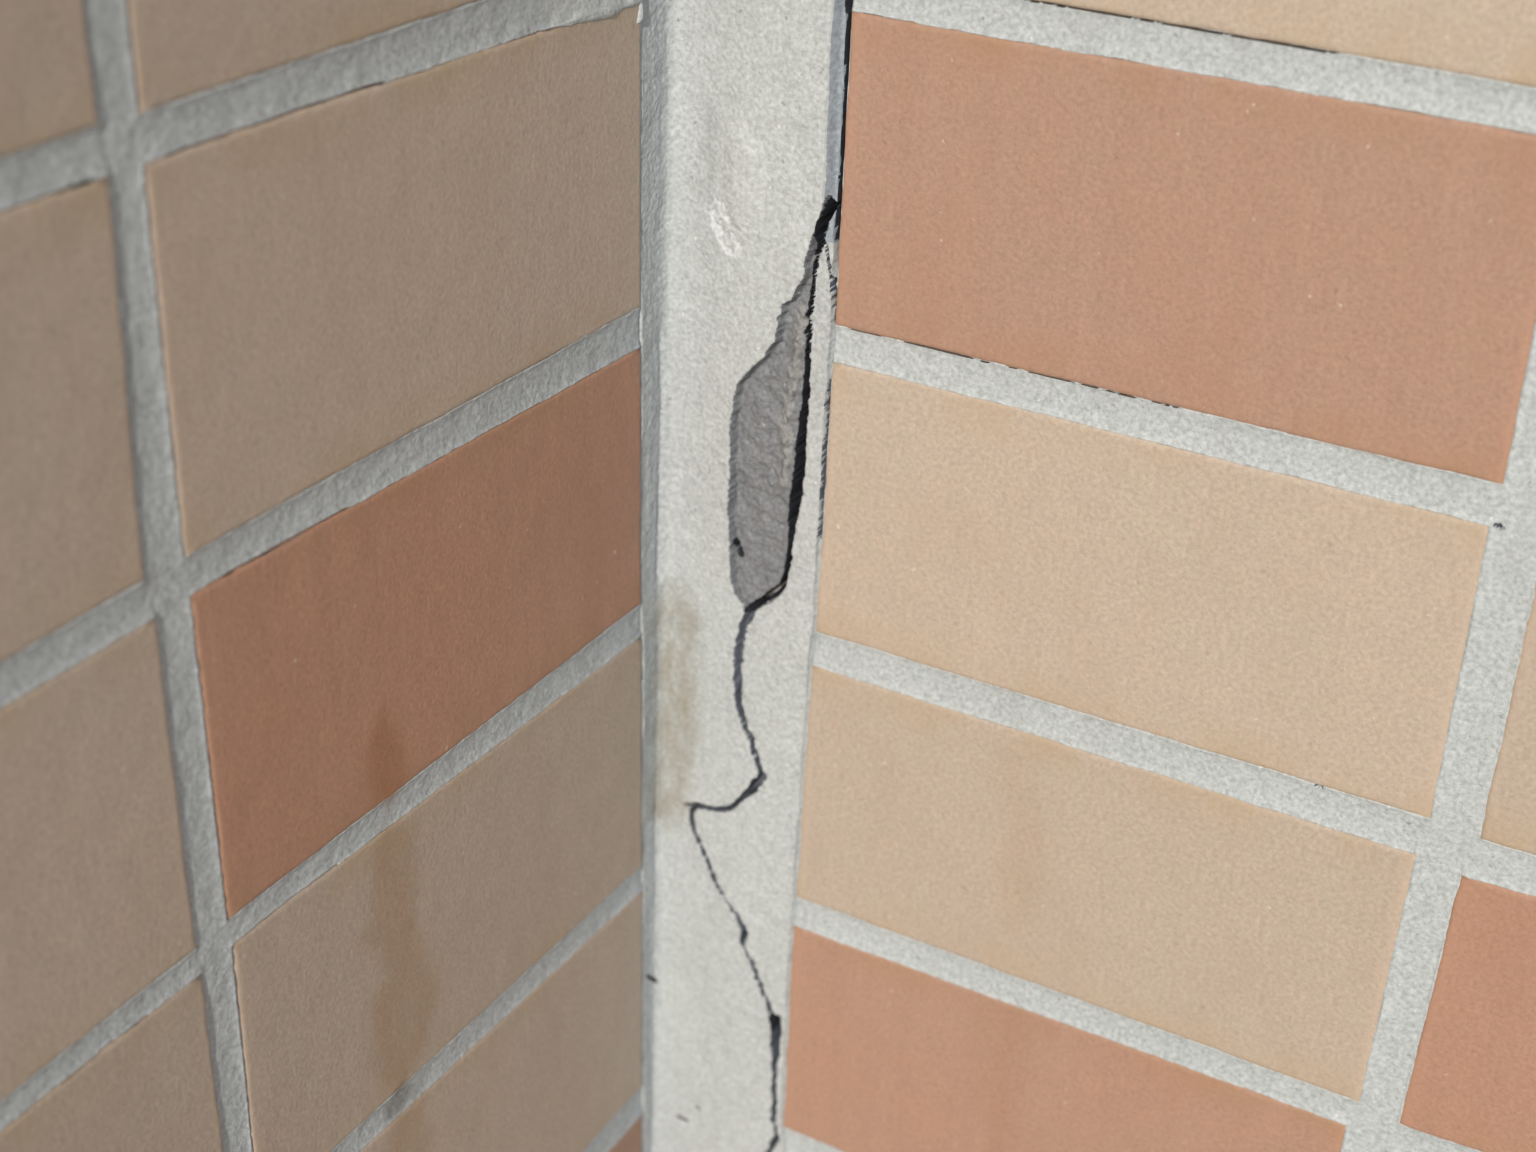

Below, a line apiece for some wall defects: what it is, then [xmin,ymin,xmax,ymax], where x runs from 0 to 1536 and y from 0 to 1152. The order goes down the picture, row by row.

spalling [726,195,842,613]
crack [684,611,782,1152]